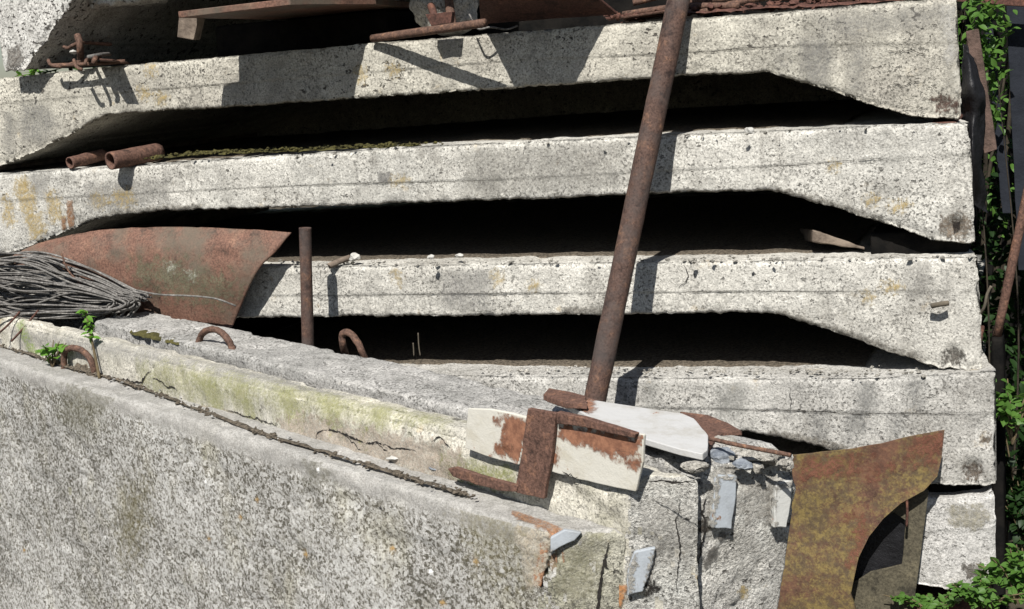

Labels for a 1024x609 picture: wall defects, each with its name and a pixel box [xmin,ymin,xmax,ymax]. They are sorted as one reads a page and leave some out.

crack [122,371,175,389]
crack [231,411,275,426]
crack [316,429,449,451]
crack [647,479,709,595]
rust [512,511,564,586]